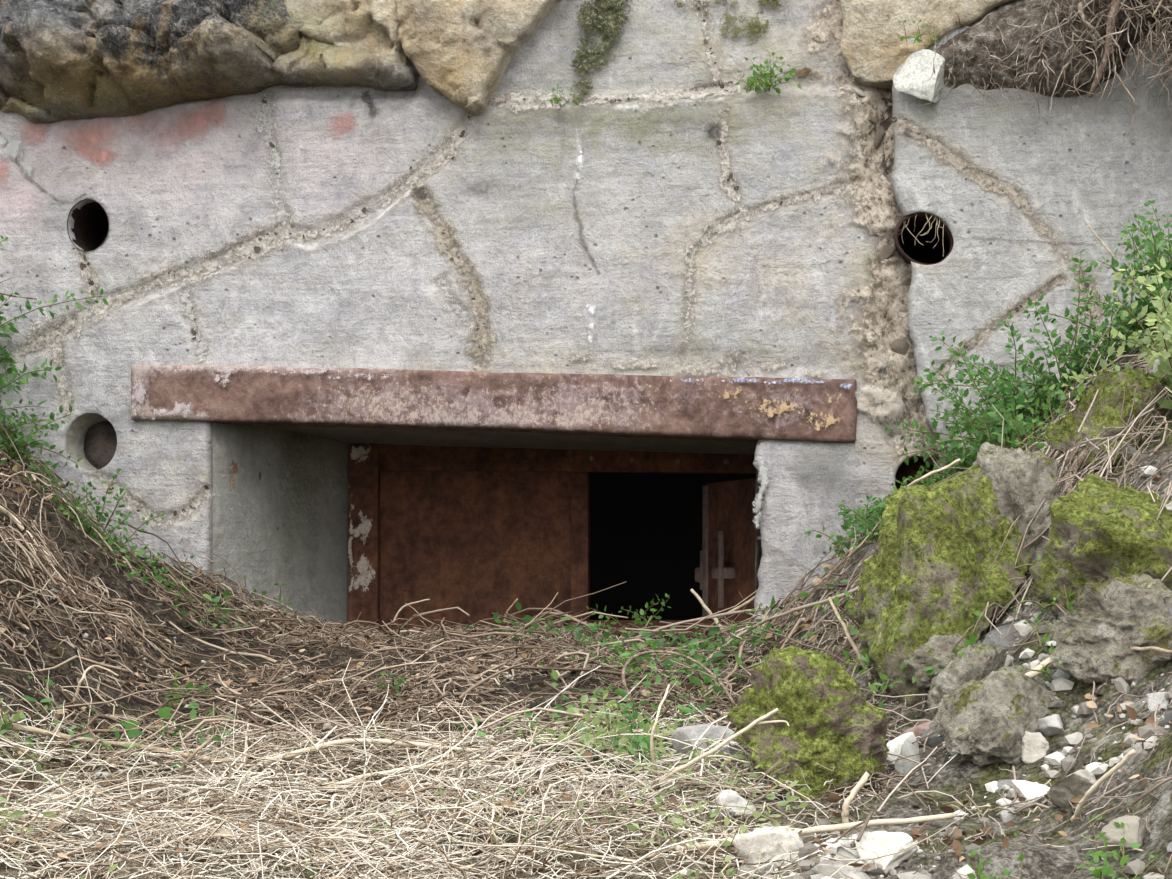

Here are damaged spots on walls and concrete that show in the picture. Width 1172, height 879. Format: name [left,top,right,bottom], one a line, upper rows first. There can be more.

crack [0,0,1105,480]
peeling [350,445,371,463]
rust [719,385,843,431]
peeling [348,483,375,605]